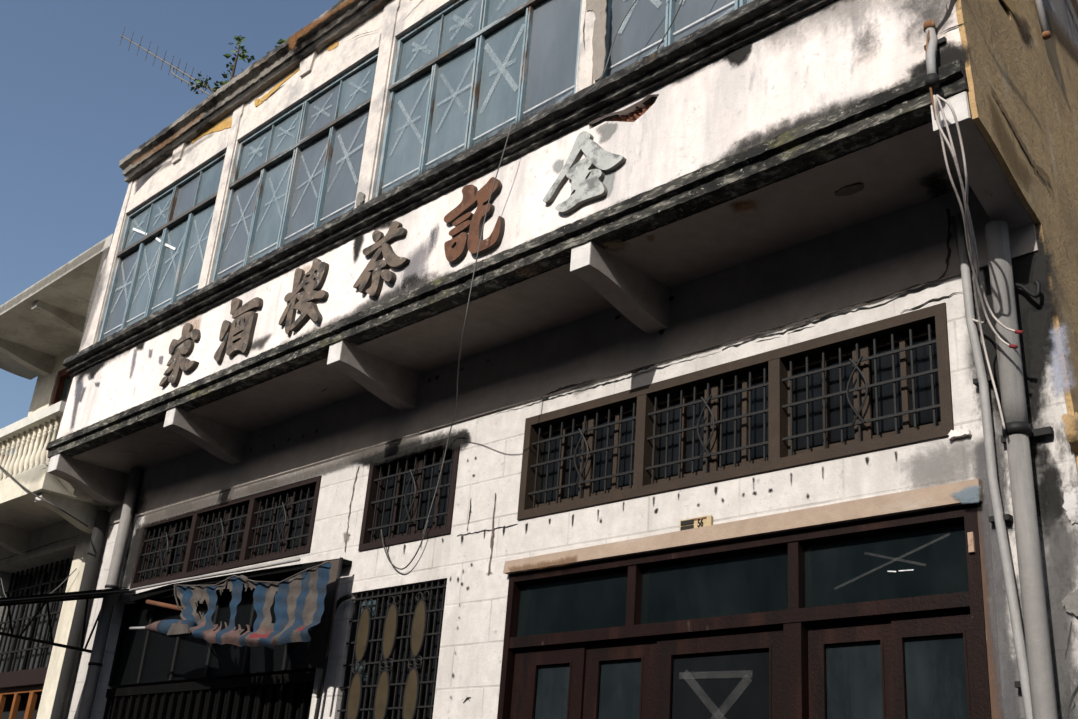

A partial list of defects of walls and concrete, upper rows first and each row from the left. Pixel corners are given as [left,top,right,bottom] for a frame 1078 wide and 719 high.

peeling [586,0,607,81]
spalling [592,96,657,127]
leakage [674,42,752,82]
leakage [720,41,970,160]
leakage [970,266,1003,417]
leakage [347,429,469,464]
crack [457,493,517,575]
leakage [1011,224,1078,719]
peeling [1062,485,1078,525]